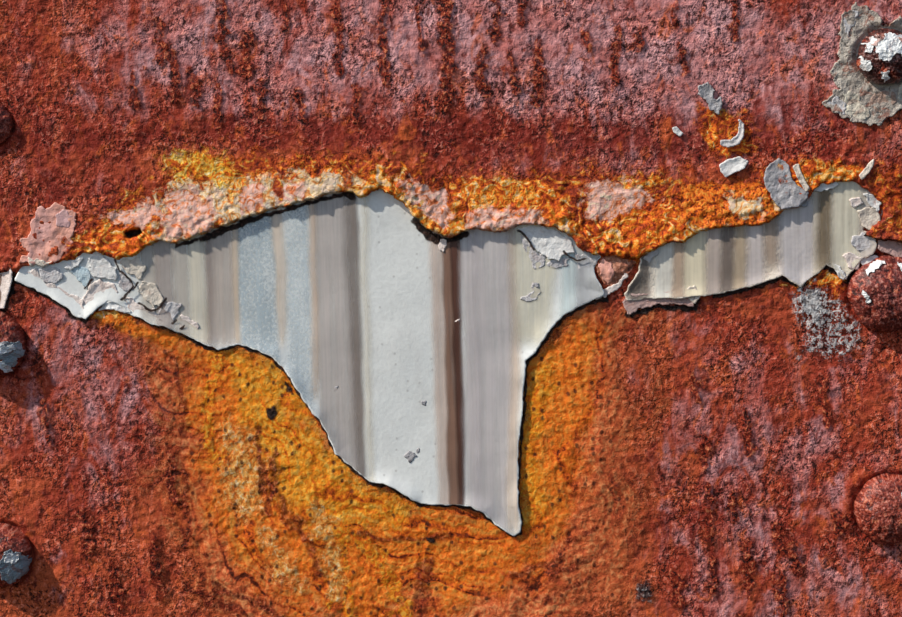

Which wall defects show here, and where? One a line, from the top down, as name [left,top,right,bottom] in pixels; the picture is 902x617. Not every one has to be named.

rust [470,0,529,98]
rust [606,24,645,91]
peeling [822,2,902,126]
rust [60,145,786,266]
peeling [698,82,722,115]
rust [693,101,758,160]
peeling [719,119,748,178]
rust [778,154,864,194]
rust [785,269,845,300]
peeling [0,158,902,536]
rust [93,306,655,617]
peeling [0,549,32,584]